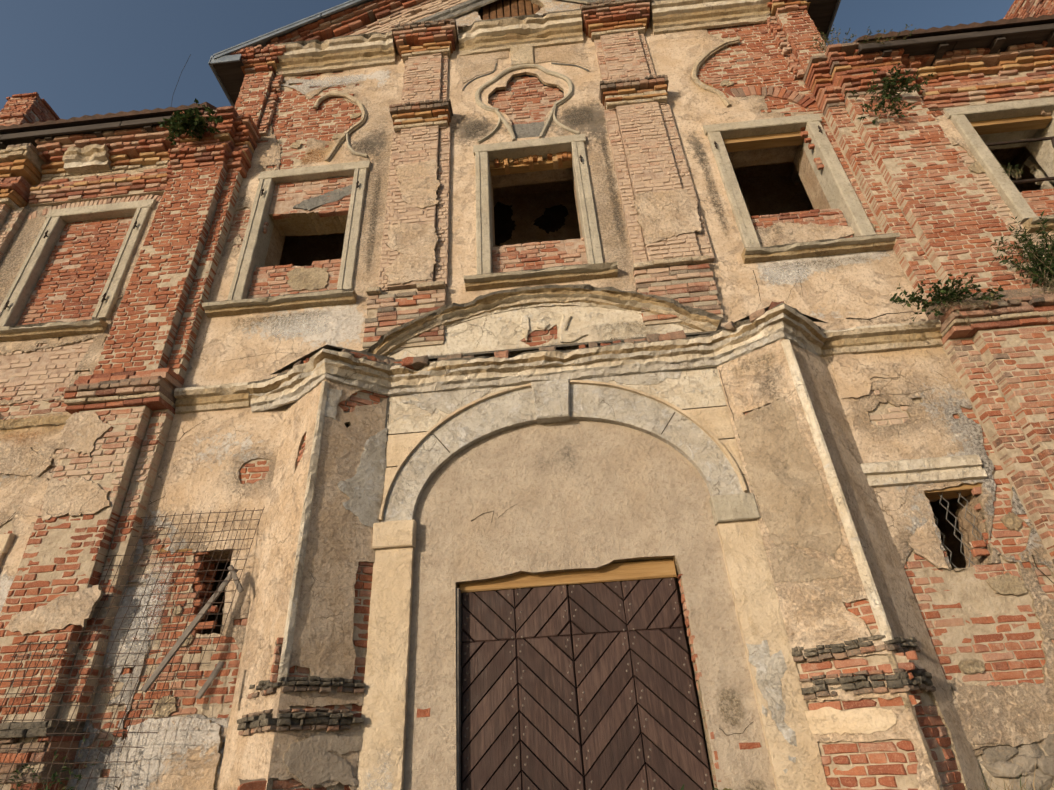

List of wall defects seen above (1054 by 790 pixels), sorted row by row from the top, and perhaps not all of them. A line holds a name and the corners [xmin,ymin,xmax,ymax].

flaking render [521,325,557,351]
flaking render [4,585,104,635]
flaking render [72,526,248,770]
flaking render [270,637,310,688]
flaking render [237,703,363,790]
flaking render [352,562,374,689]
flaking render [734,397,843,582]
flaking render [746,640,965,790]
flaking render [844,599,878,635]
flaking render [904,407,1054,687]